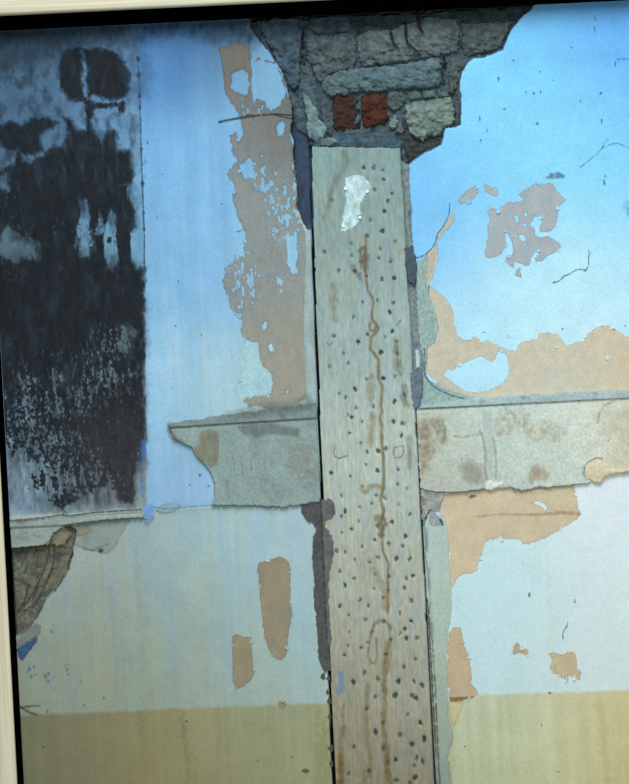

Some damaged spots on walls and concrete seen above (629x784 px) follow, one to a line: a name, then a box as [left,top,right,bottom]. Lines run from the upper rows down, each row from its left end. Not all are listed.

flaking render [219,6,531,409]
peeling [415,213,629,398]
peeling [484,180,566,278]
crack [552,251,590,283]
rust [359,235,389,608]
peeling [420,485,580,586]
flaking render [11,525,77,659]
peeling [231,634,255,690]
peeling [257,556,292,660]
peeling [446,627,478,726]
peeling [513,643,529,657]
peeling [549,651,582,681]